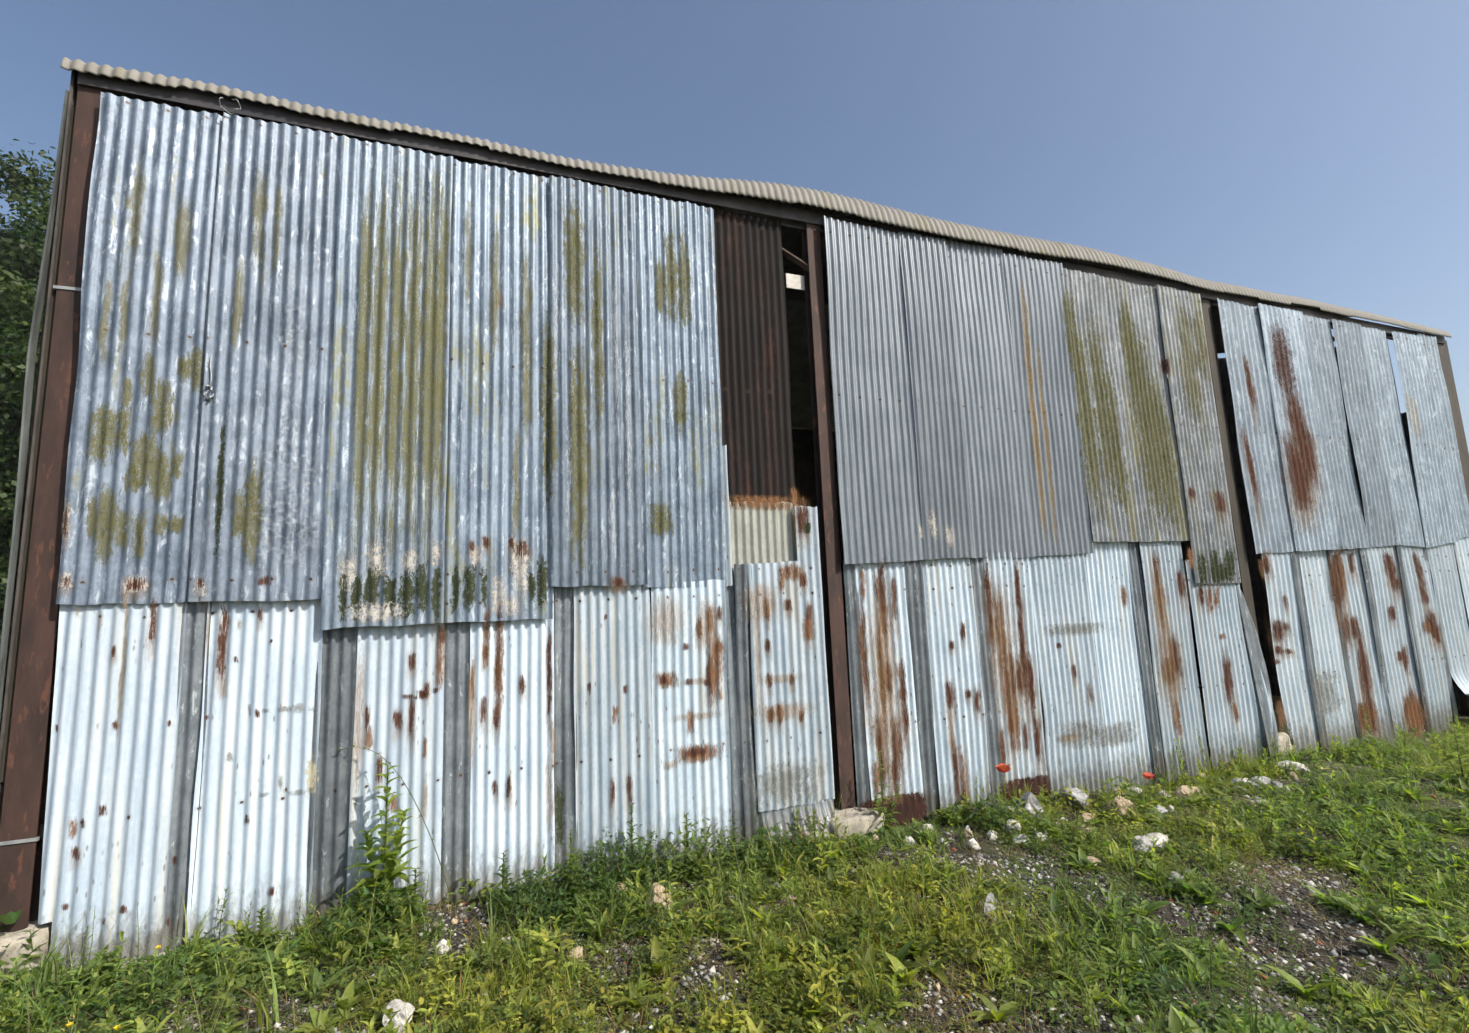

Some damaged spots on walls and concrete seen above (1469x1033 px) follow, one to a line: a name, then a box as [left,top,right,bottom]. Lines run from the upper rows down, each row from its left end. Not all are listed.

water stain [85,207,206,565]
water stain [213,411,265,567]
water stain [338,170,488,623]
water stain [512,195,605,571]
water stain [654,227,693,330]
rust [712,208,811,536]
water stain [1061,286,1187,535]
rust [393,624,446,759]
rust [471,604,526,729]
rust [657,606,726,705]
rust [859,558,929,827]
rust [983,553,1051,801]